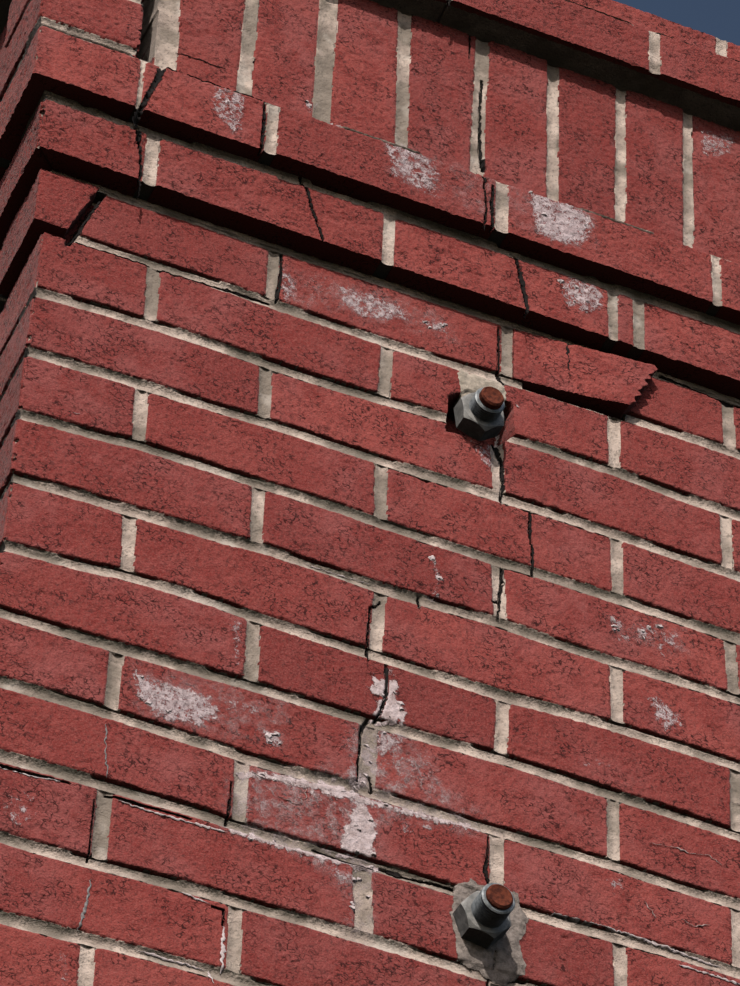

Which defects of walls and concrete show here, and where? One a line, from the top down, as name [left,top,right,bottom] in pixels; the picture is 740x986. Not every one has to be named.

efflorescence [385,144,439,196]
crack [476,81,495,232]
efflorescence [528,191,595,246]
efflorescence [340,287,408,320]
crack [513,257,529,321]
efflorescence [557,279,602,313]
crack [495,328,504,386]
crack [491,445,505,503]
crack [527,514,535,577]
crack [493,569,505,621]
crack [356,604,389,794]
efflorescence [118,671,485,885]